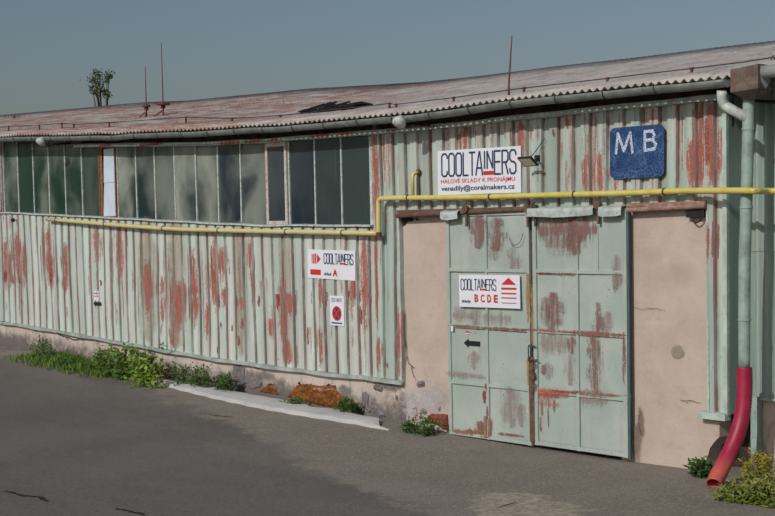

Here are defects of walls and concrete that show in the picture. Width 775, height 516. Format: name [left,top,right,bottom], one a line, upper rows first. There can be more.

rust [132,235,154,320]
rust [167,260,190,348]
rust [275,279,298,364]
rust [470,215,519,269]
rust [451,272,631,406]
flaking render [232,365,386,418]
flaking render [421,407,449,431]
rust [452,416,525,438]